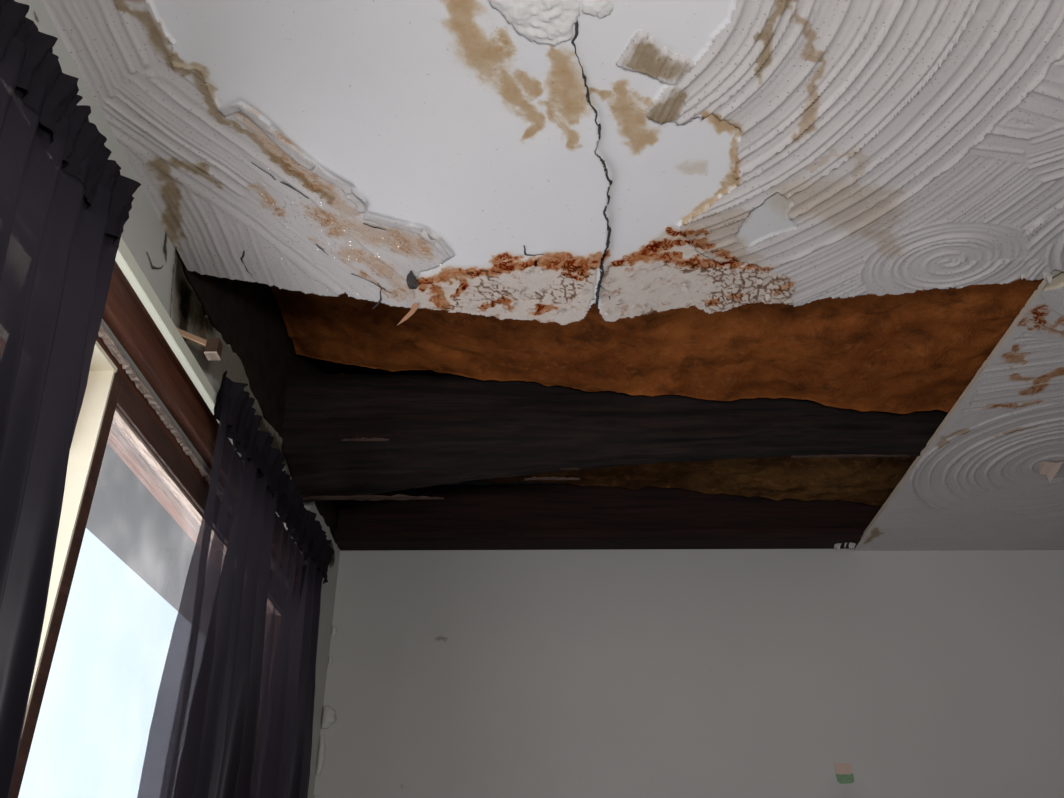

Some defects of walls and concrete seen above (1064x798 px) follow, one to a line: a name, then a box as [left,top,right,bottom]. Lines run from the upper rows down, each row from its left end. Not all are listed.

flaking render [146,0,769,318]
crack [444,21,616,311]
flaking render [735,192,798,247]
corrosion [416,227,769,308]
crack [666,261,794,311]
corrosion [1019,305,1064,330]